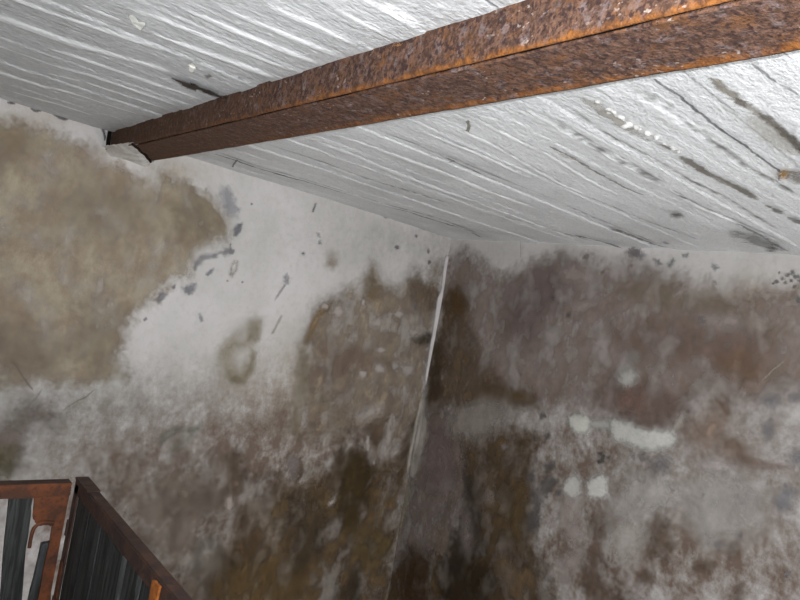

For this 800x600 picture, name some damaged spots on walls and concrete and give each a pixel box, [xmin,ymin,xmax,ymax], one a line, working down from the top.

water stain [0,119,226,385]
water stain [108,247,800,600]